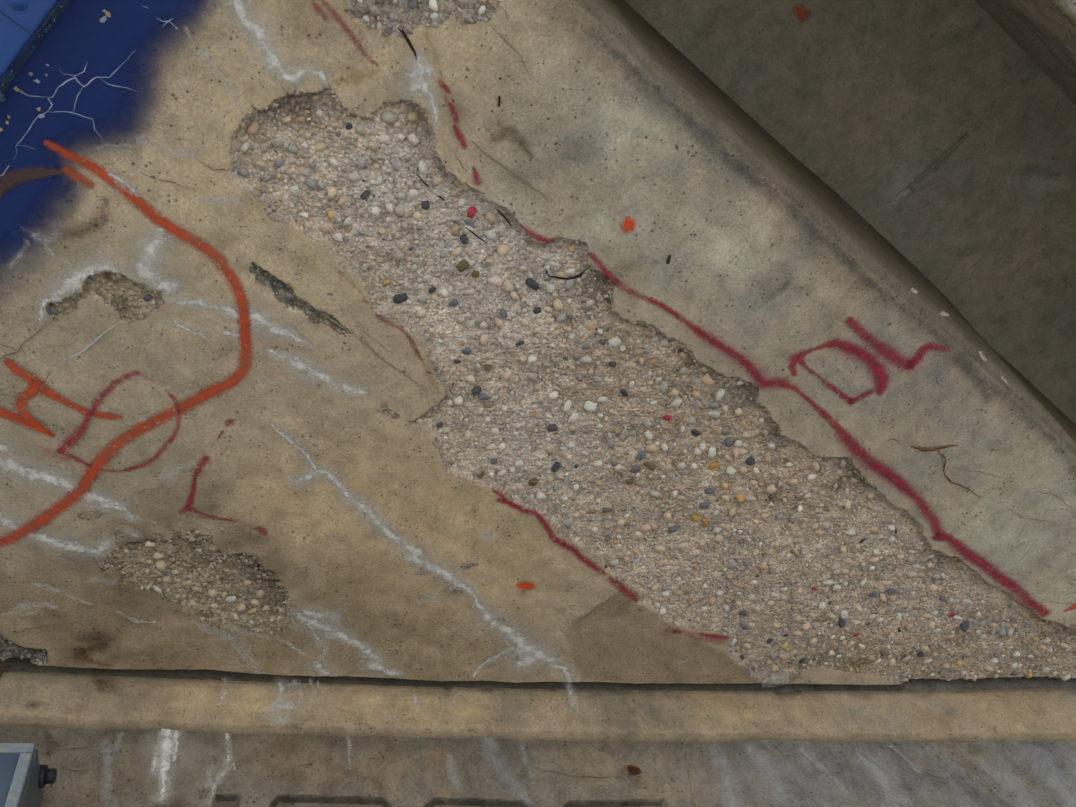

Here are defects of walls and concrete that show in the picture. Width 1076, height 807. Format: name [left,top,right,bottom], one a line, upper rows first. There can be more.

spalling [344,0,500,38]
crack [0,50,138,176]
spalling [46,270,164,323]
spalling [228,84,1076,684]
crack [884,439,1008,498]
spalling [93,527,300,637]
spalling [0,635,47,665]